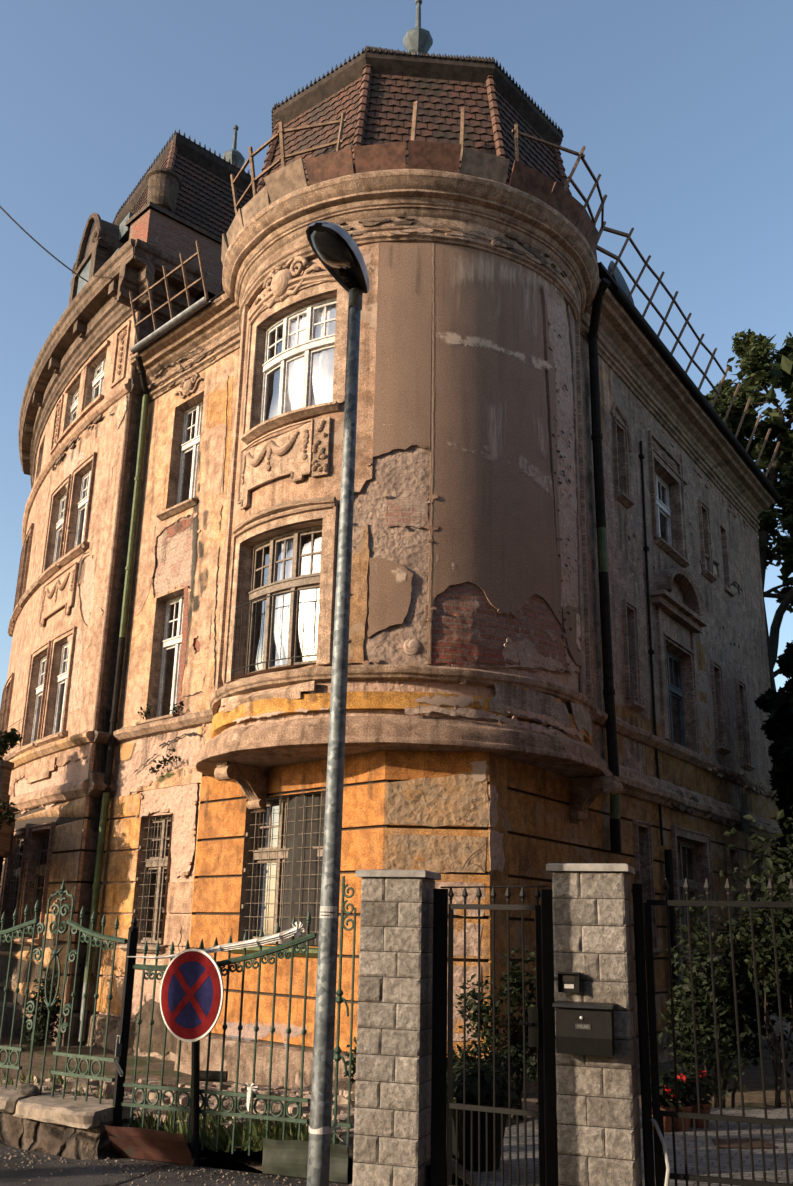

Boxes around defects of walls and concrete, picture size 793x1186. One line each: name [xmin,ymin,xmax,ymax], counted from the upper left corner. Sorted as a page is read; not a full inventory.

spalling [338,215,586,716]
spalling [150,513,201,598]
peeling [558,699,592,736]